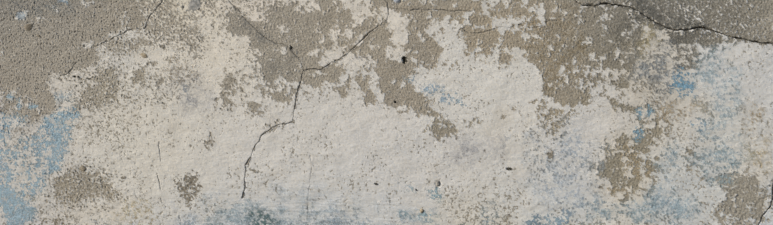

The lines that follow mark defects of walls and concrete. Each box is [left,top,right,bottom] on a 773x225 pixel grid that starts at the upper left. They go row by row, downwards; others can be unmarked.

peeling [24,154,135,225]
peeling [0,0,206,163]
crack [228,0,557,198]
peeling [196,0,773,207]
crack [576,1,773,45]
peeling [674,144,773,225]